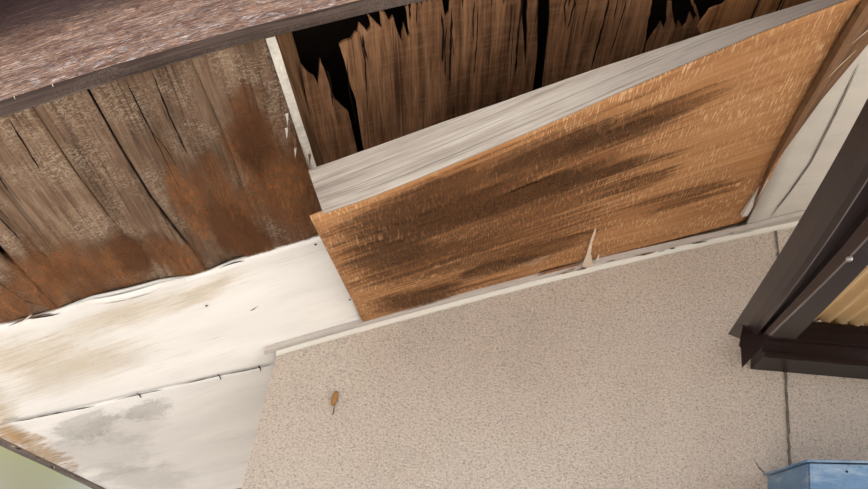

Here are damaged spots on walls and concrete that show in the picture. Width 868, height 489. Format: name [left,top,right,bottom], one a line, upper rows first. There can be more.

crack [8,118,40,169]
crack [124,70,189,207]
damp [165,86,322,256]
damp [330,83,719,313]
damp [636,179,736,214]
crack [0,284,60,326]
damp [0,232,207,323]
crack [3,406,93,422]
crack [185,365,270,384]
crack [784,372,792,465]